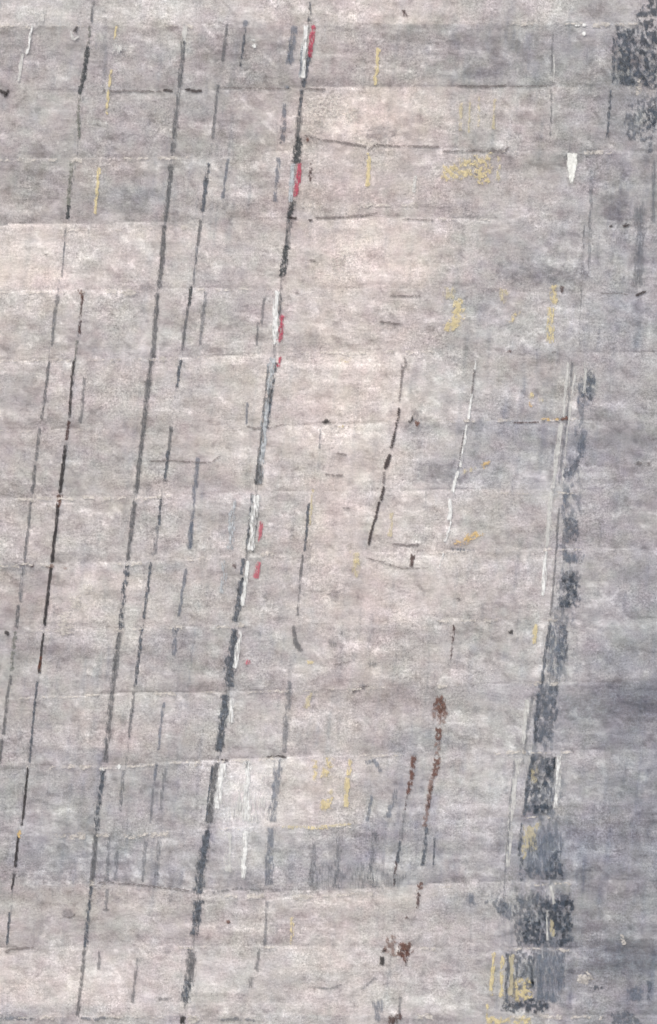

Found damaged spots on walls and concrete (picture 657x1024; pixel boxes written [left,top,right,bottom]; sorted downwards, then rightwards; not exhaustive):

corrosion [405,756,416,810]
corrosion [423,695,447,827]
corrosion [380,936,412,965]